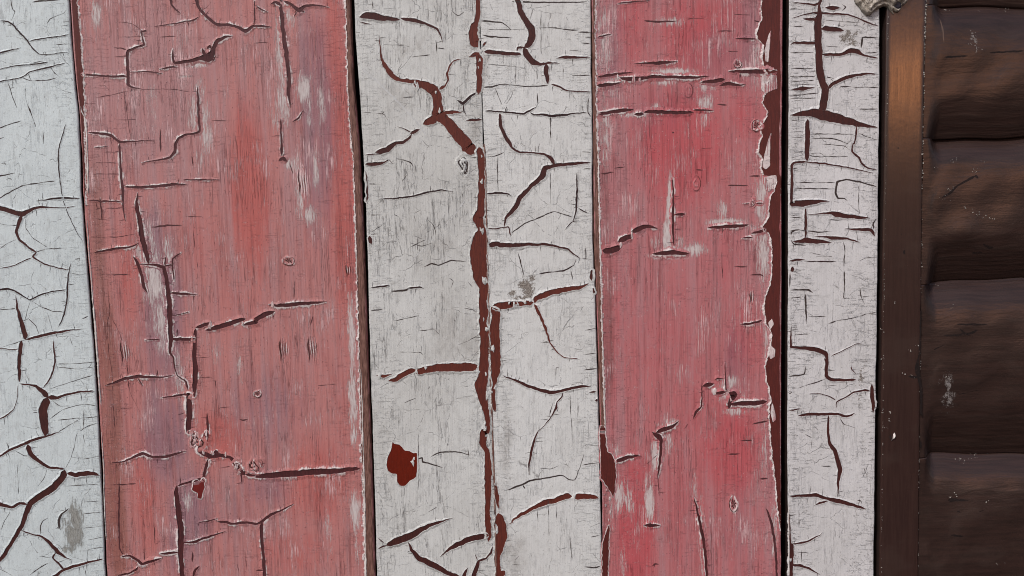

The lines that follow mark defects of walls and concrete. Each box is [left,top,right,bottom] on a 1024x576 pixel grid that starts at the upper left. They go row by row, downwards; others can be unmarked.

crack [0,0,360,576]
peeling [385,441,419,488]
crack [358,0,879,576]
peeling [754,0,783,531]